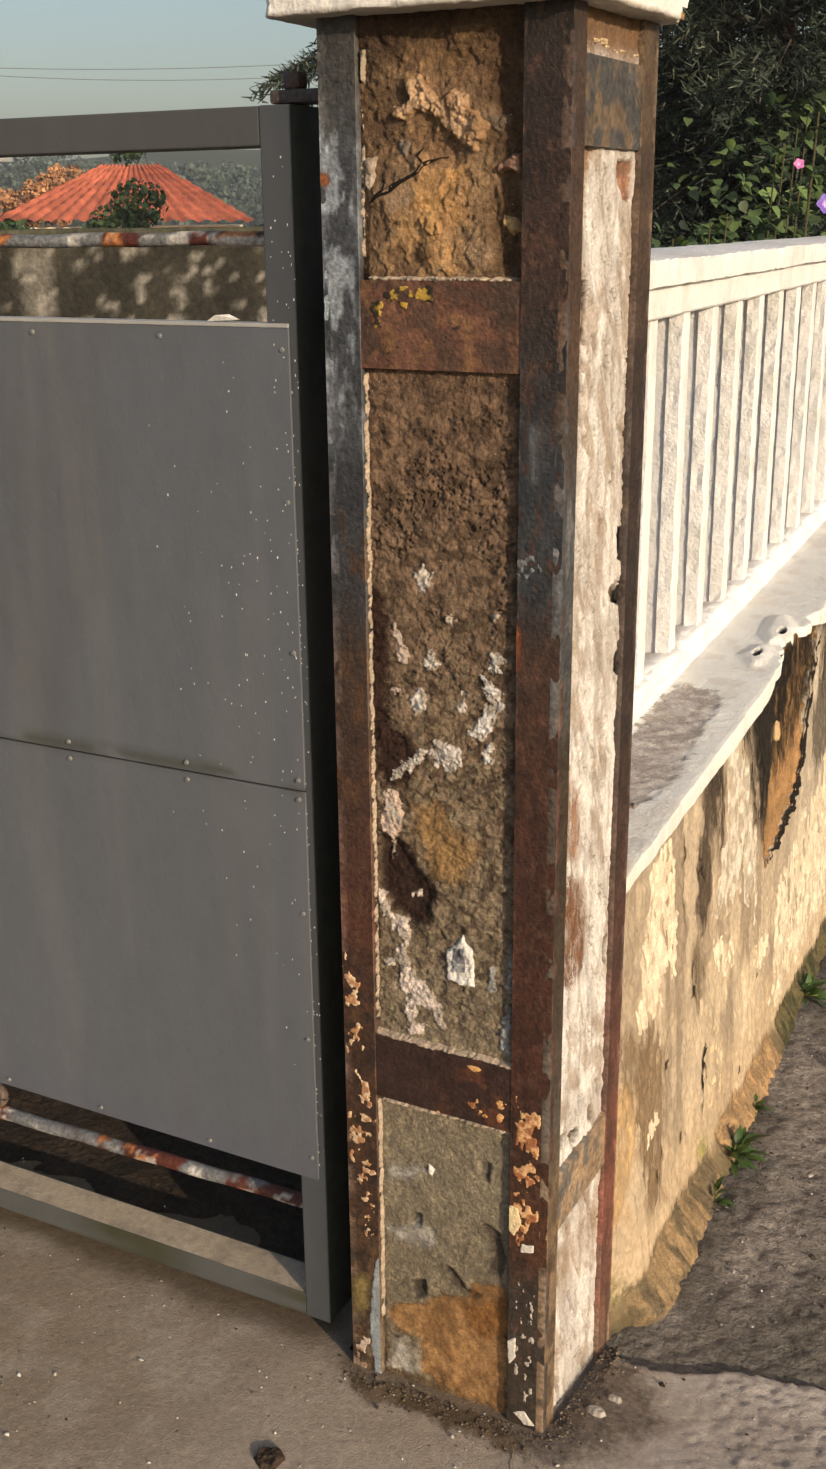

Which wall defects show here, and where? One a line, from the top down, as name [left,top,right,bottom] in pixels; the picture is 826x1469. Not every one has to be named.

rust [320,173,330,186]
crack [369,147,449,204]
peeling [410,563,434,593]
peeling [390,622,442,716]
peeling [378,888,447,1035]
peeling [379,652,508,854]
rust [567,784,579,858]
rust [564,879,584,981]
damp [694,764,725,1008]
spalling [627,626,826,1327]
rust [468,1096,541,1246]
spalling [356,1206,535,1426]